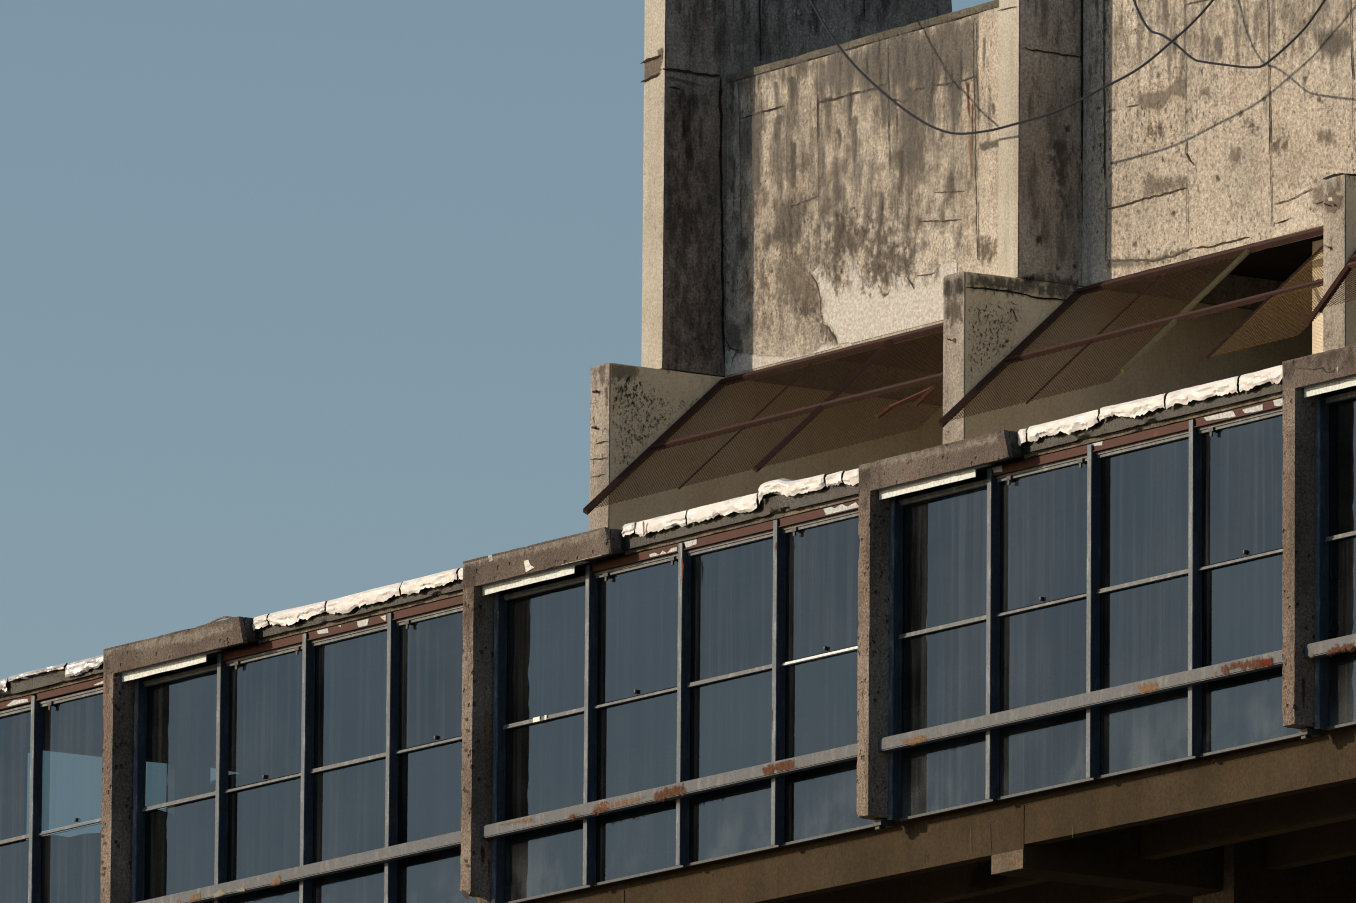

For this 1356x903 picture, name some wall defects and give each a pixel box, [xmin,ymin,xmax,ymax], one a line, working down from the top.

water stain [1073,0,1356,252]
water stain [725,16,1079,376]
corrosion [1213,658,1272,676]
corrosion [1138,683,1157,693]
corrosion [569,783,685,820]
corrosion [177,888,244,903]